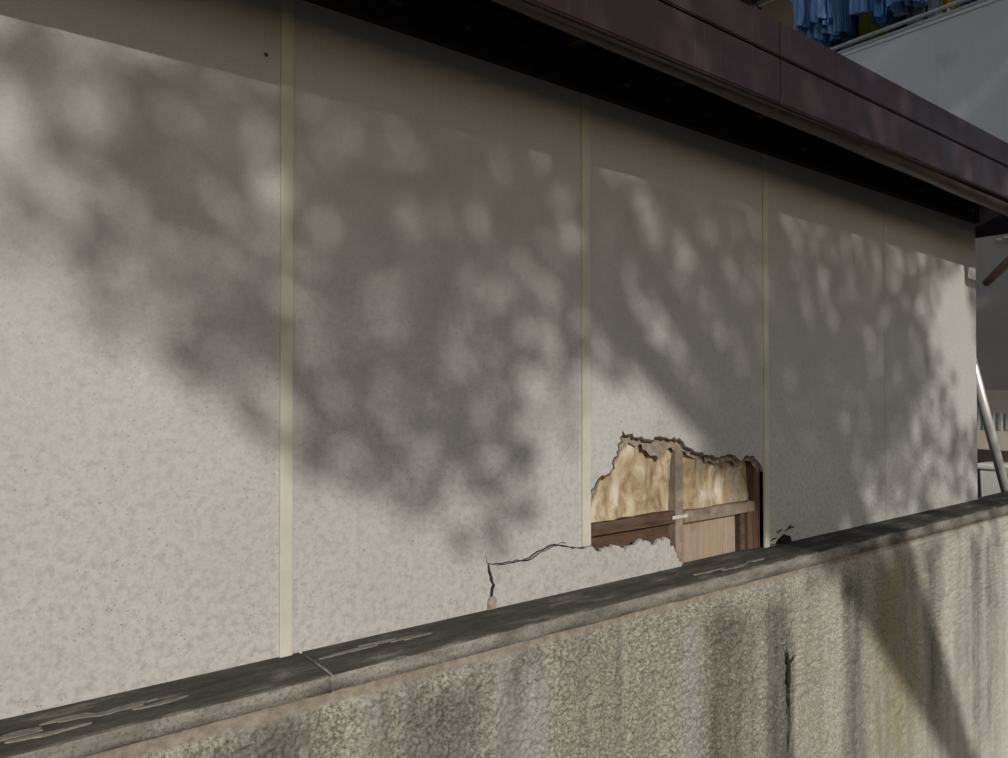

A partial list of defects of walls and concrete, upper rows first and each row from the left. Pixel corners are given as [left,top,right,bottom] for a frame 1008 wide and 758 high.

crack [486,542,585,610]
spalling [571,430,794,576]